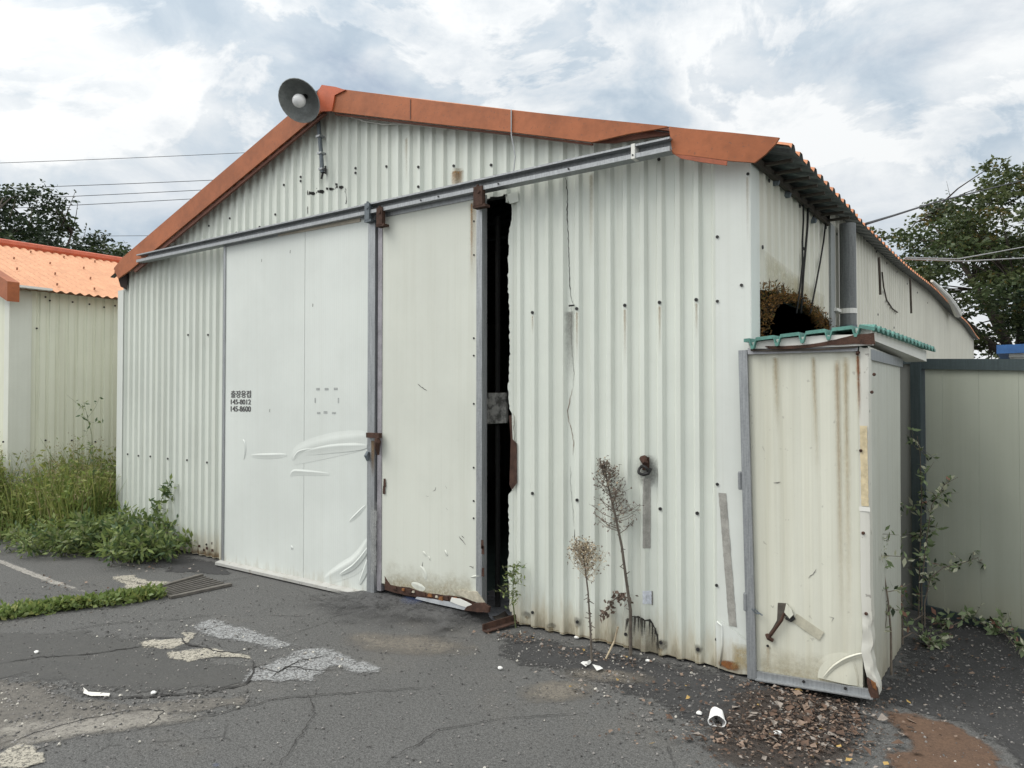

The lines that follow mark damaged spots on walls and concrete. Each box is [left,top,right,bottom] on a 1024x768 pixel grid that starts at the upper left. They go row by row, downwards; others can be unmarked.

corrosion [385,577,491,613]
water stain [625,616,659,655]